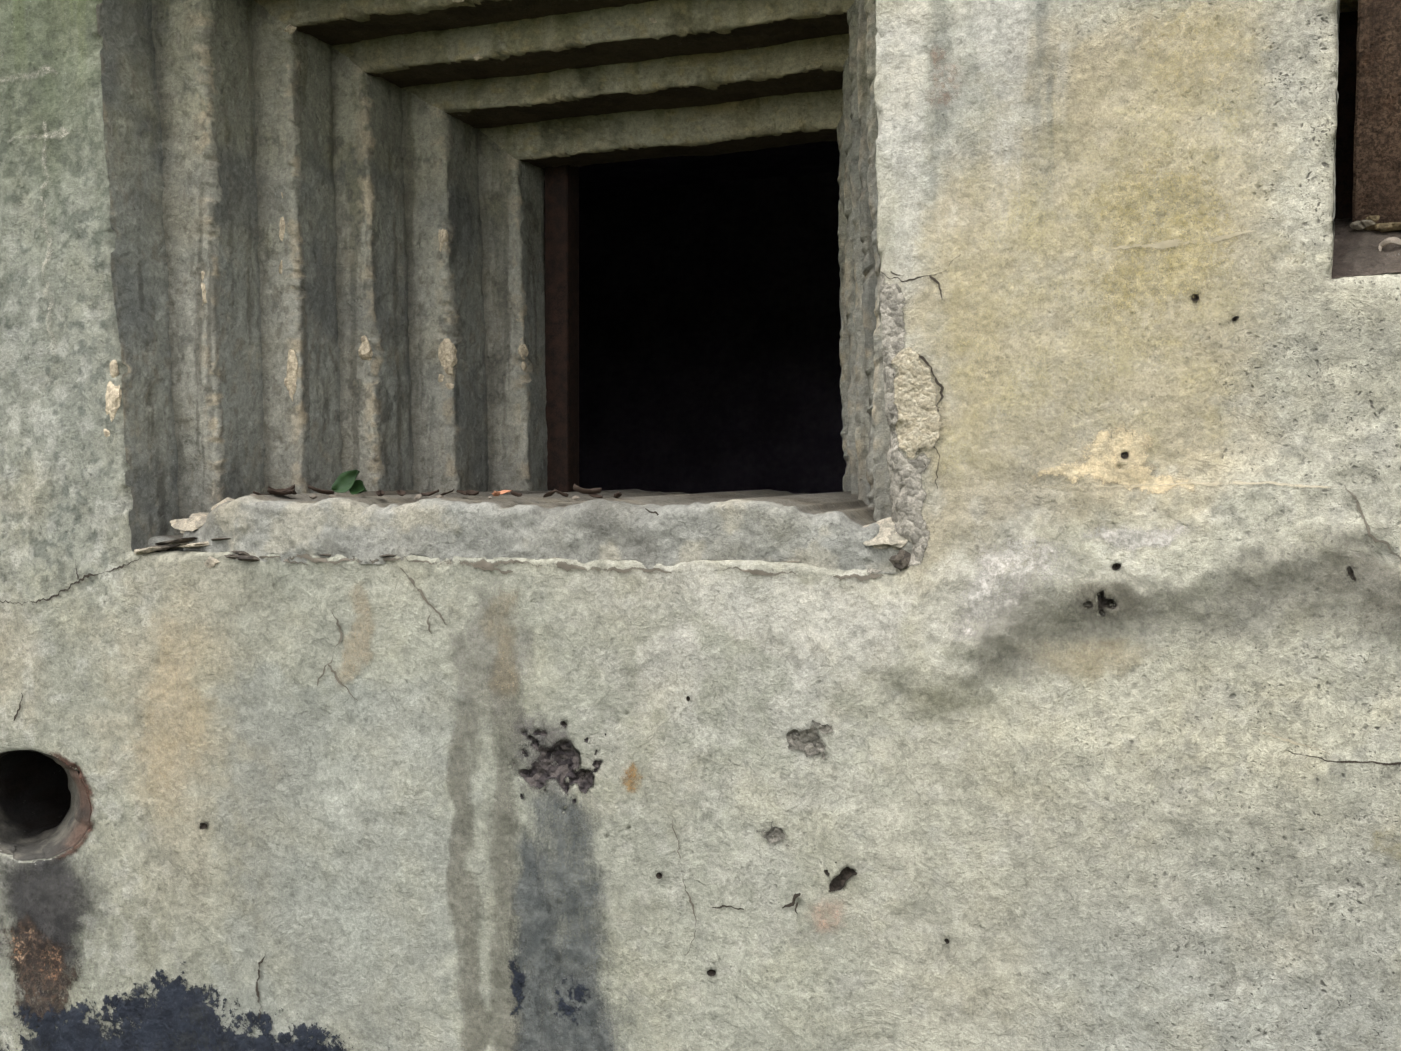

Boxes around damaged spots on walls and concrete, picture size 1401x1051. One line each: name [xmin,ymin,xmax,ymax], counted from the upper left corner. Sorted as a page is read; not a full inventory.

spalling [880,273,944,566]
peeling [1109,425,1152,470]
crack [1344,485,1401,559]
crack [0,552,151,604]
spalling [1083,590,1116,616]
spalling [513,715,606,803]
spalling [786,720,833,759]
damp [447,603,624,1051]
spalling [824,862,857,892]
rust [0,916,82,1028]